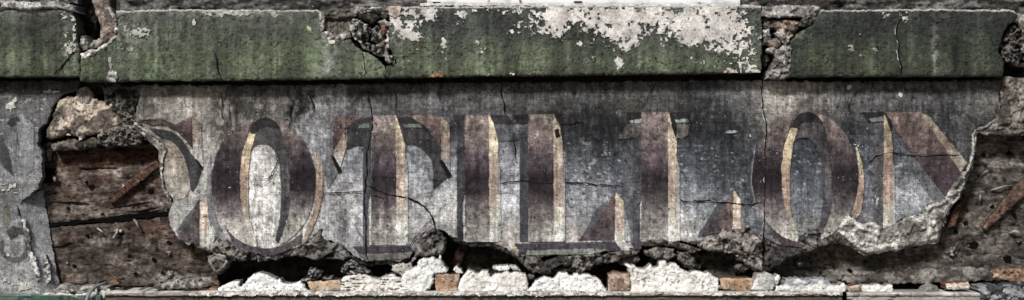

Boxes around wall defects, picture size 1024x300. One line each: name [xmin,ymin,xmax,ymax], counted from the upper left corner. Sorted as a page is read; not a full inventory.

spalling [60,0,173,202]
crack [326,52,454,260]
peeling [319,4,820,81]
crack [679,76,781,241]
spalling [527,14,1024,282]
crack [894,11,902,76]
spalling [193,228,512,275]